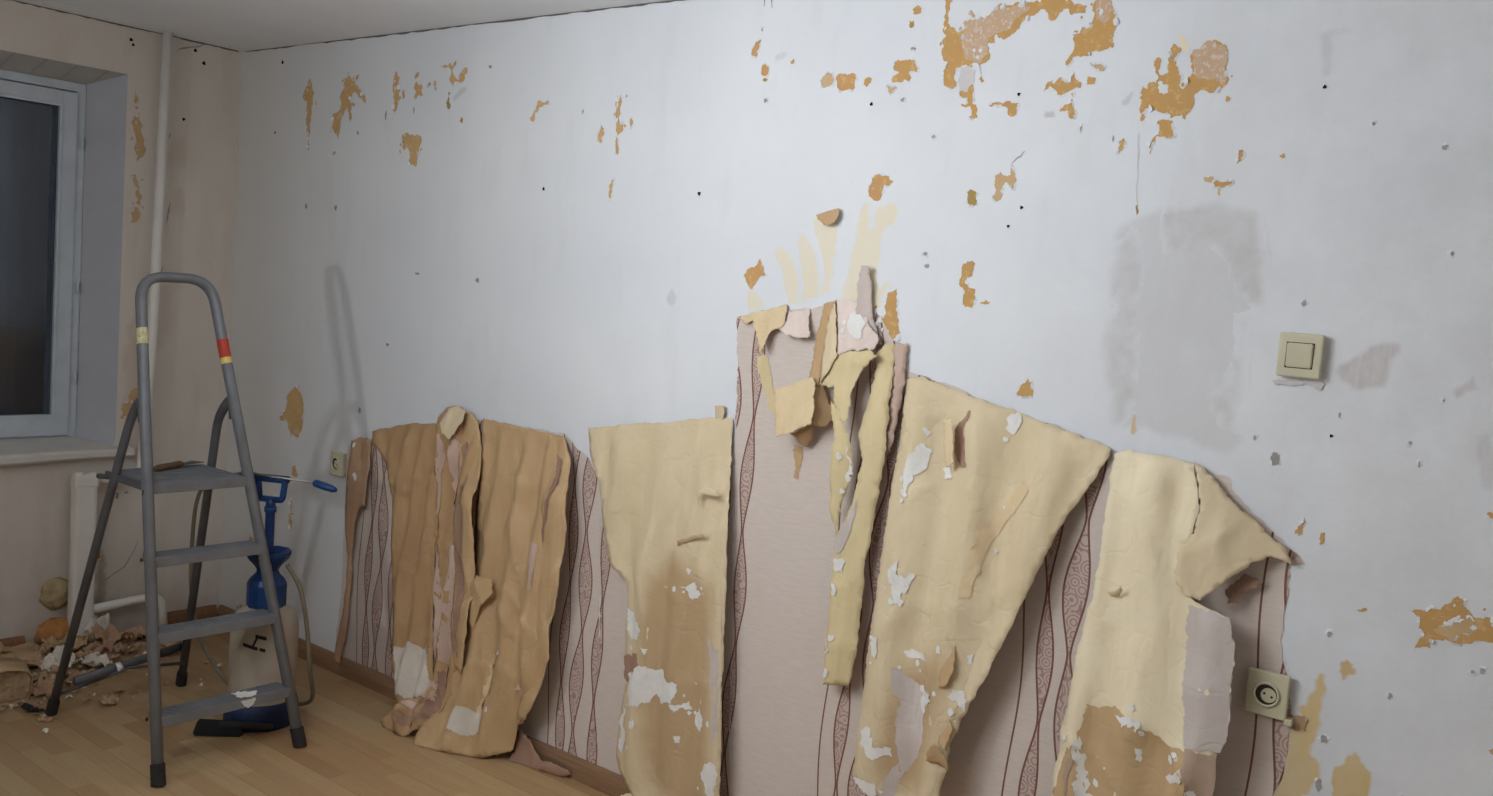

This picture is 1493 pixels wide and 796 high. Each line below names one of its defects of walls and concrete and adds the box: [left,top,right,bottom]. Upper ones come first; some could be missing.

peeling [331,72,366,156]
peeling [385,61,468,123]
peeling [819,5,921,104]
peeling [940,0,1119,135]
peeling [1139,40,1233,153]
peeling [867,173,893,201]
peeling [743,259,768,291]
peeling [959,259,990,308]
peeling [875,289,902,342]
peeling [279,385,304,440]
peeling [1014,379,1034,399]
peeling [1410,596,1493,650]